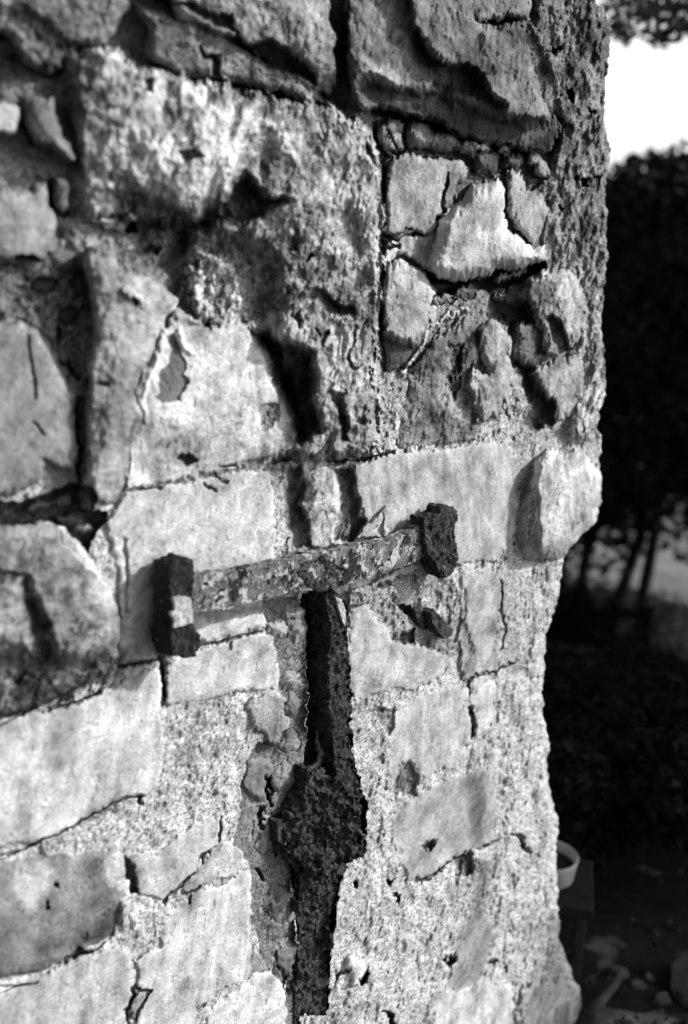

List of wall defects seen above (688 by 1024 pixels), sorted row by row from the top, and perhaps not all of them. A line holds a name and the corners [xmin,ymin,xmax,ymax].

rust [268,815,304,873]
rust [335,862,349,885]
crack [414,834,528,884]
rust [290,885,302,916]
rust [322,926,334,950]